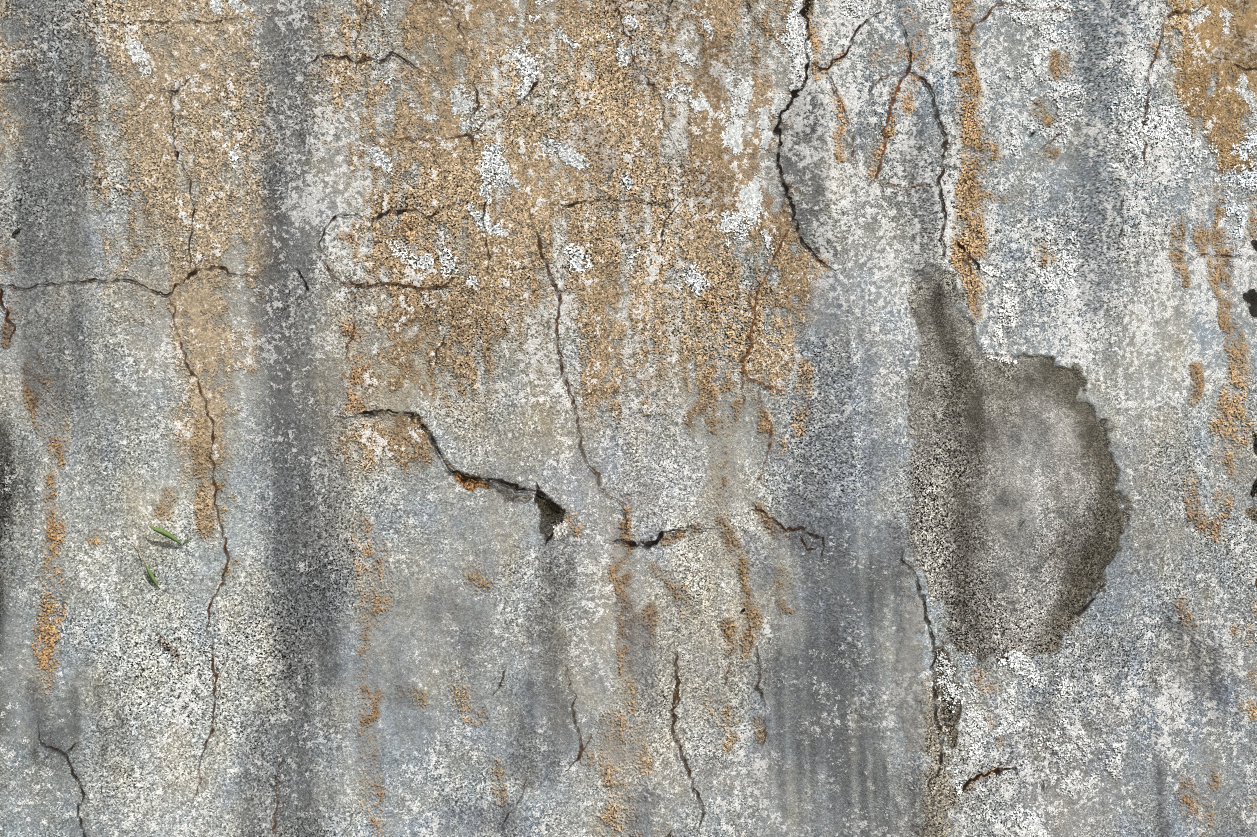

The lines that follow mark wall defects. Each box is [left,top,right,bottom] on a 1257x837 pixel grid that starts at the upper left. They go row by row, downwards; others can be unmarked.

peeling [923,0,1257,251]
crack [296,0,735,552]
peeling [301,0,883,541]
crack [740,0,1081,562]
peeling [1031,218,1103,303]
spalling [1243,289,1257,317]
leakage [0,428,15,536]
crack [0,78,262,799]
spalling [891,255,1134,837]
crack [38,728,87,837]
crack [562,661,592,772]
crack [725,622,767,744]